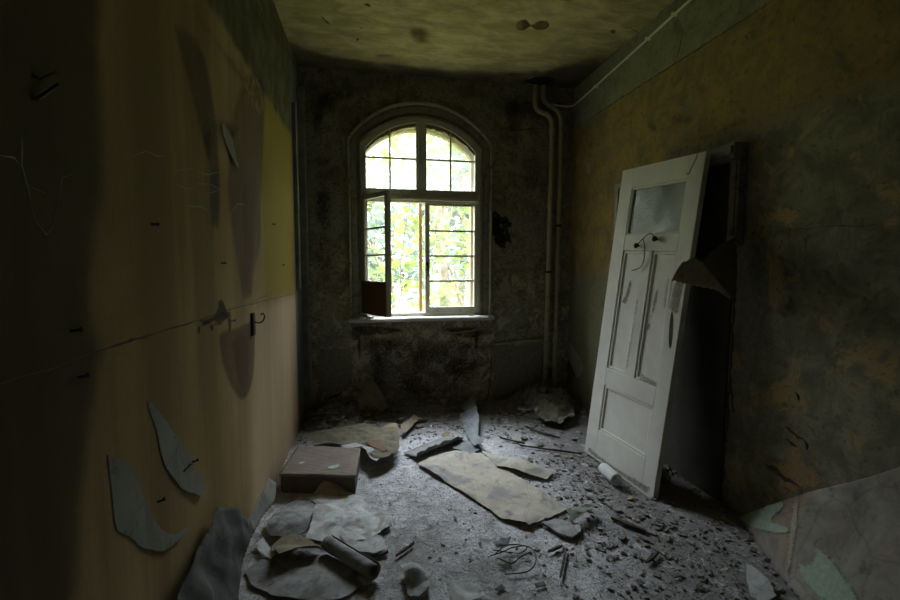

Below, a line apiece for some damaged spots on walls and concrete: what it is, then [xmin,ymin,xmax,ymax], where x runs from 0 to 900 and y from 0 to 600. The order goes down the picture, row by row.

leakage [516,20,549,31]
leakage [492,211,512,248]
peeling [147,401,205,496]
peeling [107,455,187,552]